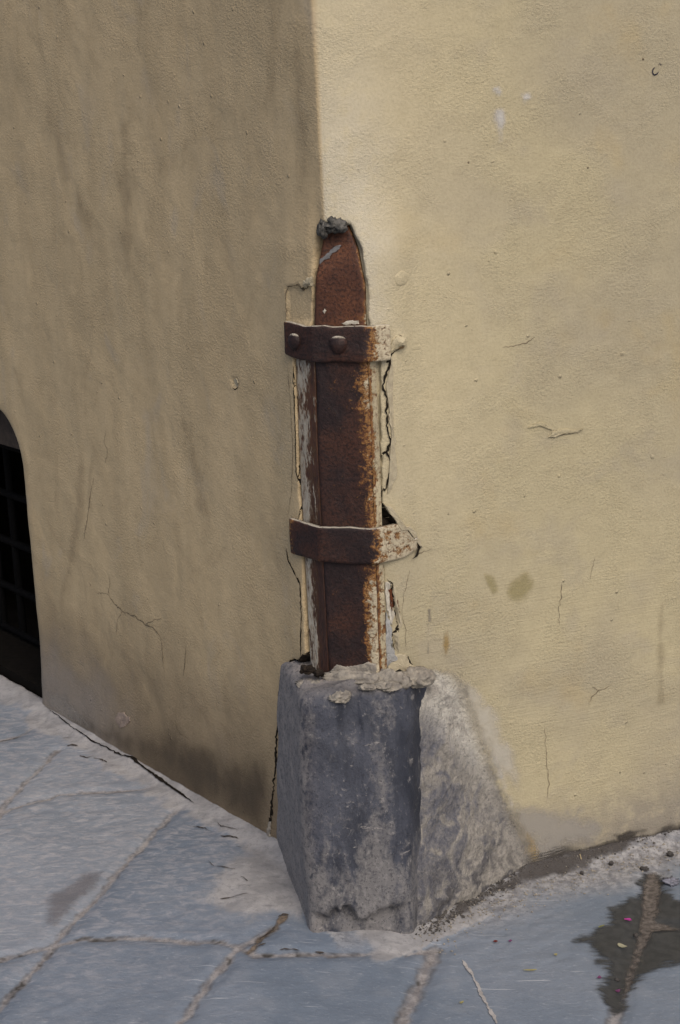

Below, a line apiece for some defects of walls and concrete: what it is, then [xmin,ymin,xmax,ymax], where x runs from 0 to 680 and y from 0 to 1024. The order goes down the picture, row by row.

crack [381,335,401,503]
flaking render [381,490,432,559]
crack [98,579,186,675]
flaking render [385,582,415,671]
crack [45,706,248,899]
crack [267,727,278,837]
water stain [573,873,680,1015]